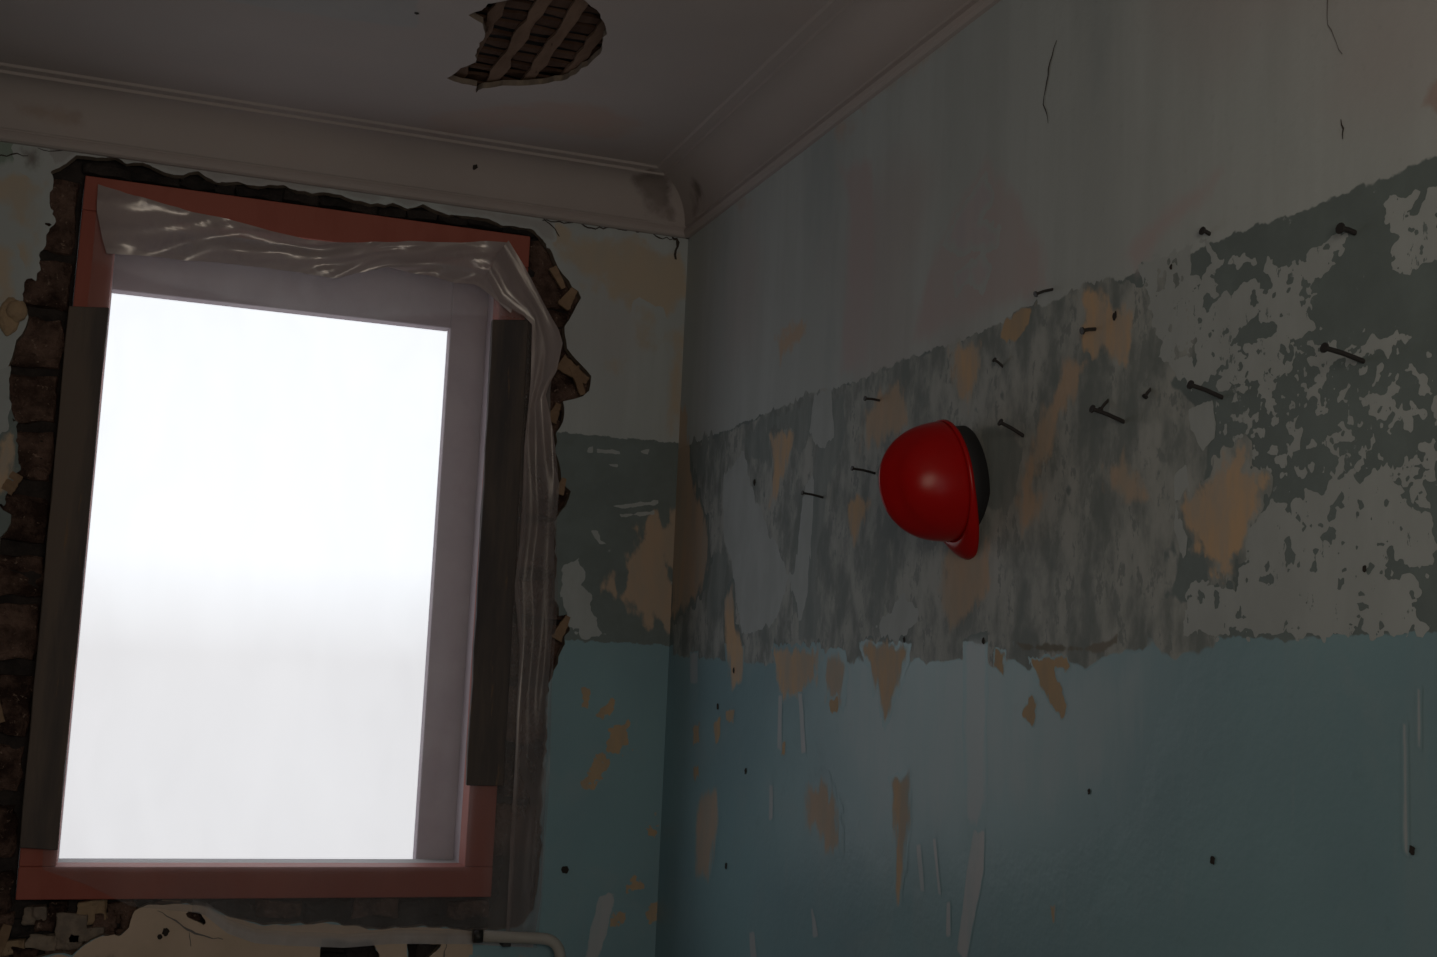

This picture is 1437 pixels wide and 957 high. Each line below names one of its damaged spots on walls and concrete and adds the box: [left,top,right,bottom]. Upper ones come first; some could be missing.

flaking render [50,149,104,168]
spalling [0,159,687,957]
spalling [453,0,606,86]
peeling [672,150,1437,915]